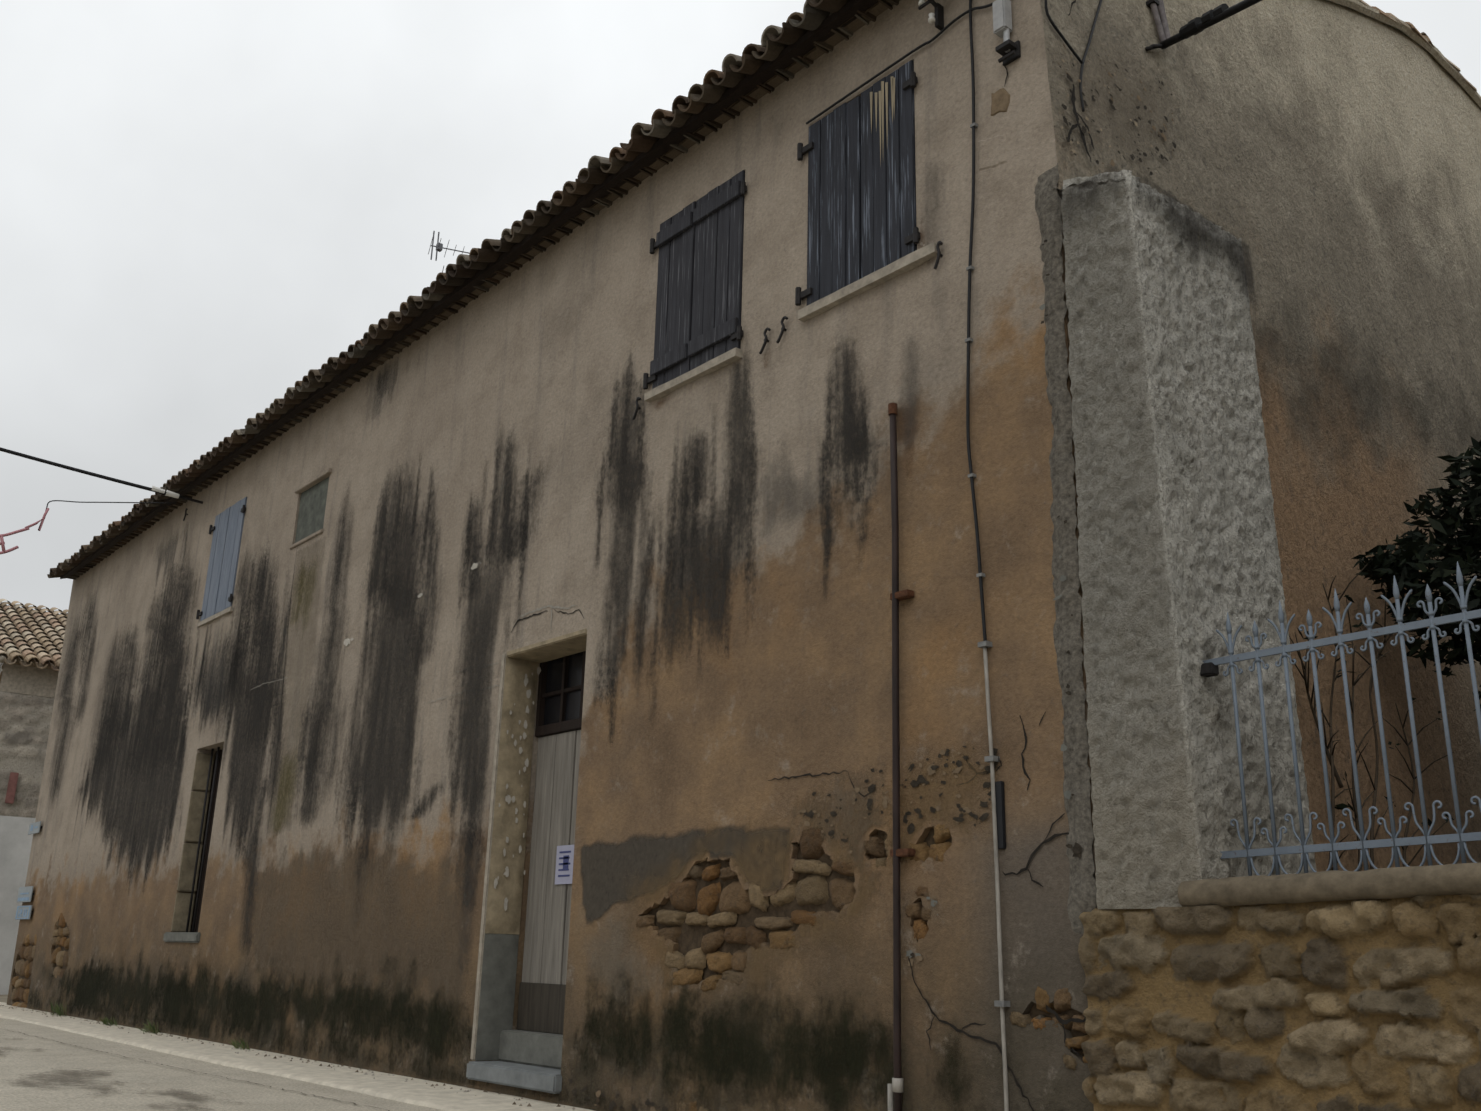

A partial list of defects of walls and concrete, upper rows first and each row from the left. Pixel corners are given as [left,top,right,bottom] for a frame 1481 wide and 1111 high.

damp [597,358,754,688]
damp [820,346,876,547]
damp [51,558,289,944]
damp [300,445,539,917]
spalling [636,746,999,992]
crack [956,711,1046,790]
crack [1002,813,1069,887]
crack [908,957,1034,1111]